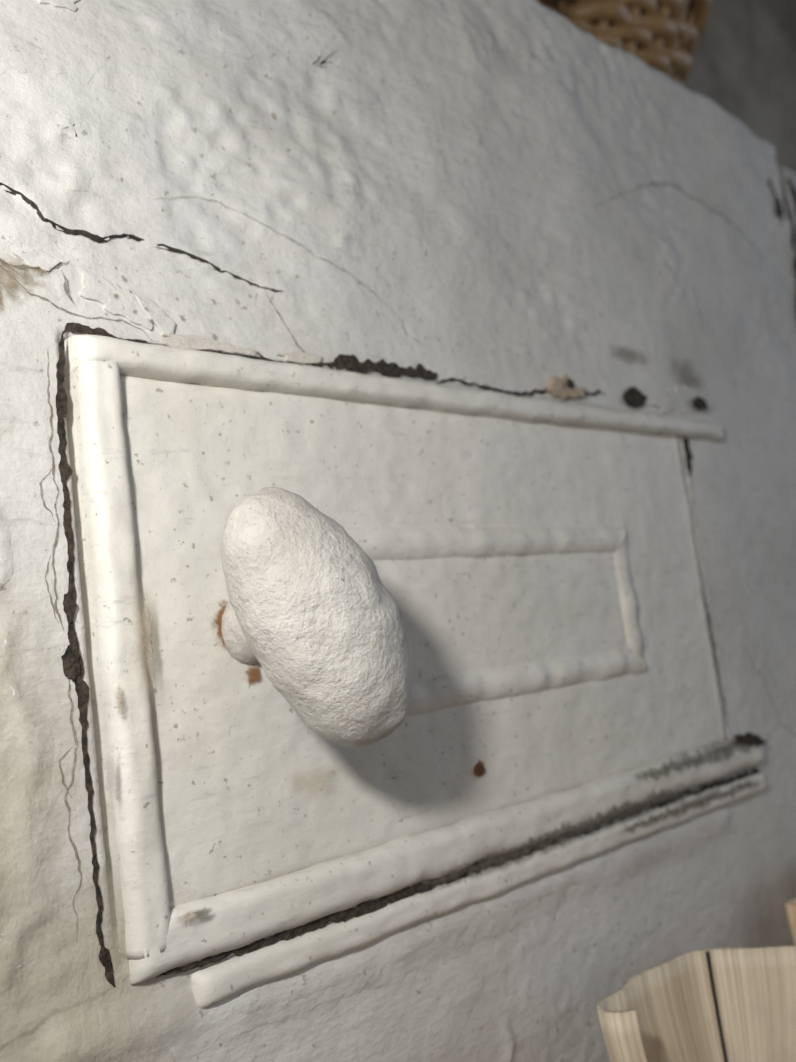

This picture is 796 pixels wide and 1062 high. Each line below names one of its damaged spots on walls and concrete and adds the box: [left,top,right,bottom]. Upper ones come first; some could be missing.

crack [0,182,306,353]
crack [39,349,64,631]
corrosion [214,602,226,645]
corrosion [246,666,261,684]
crack [58,678,82,943]